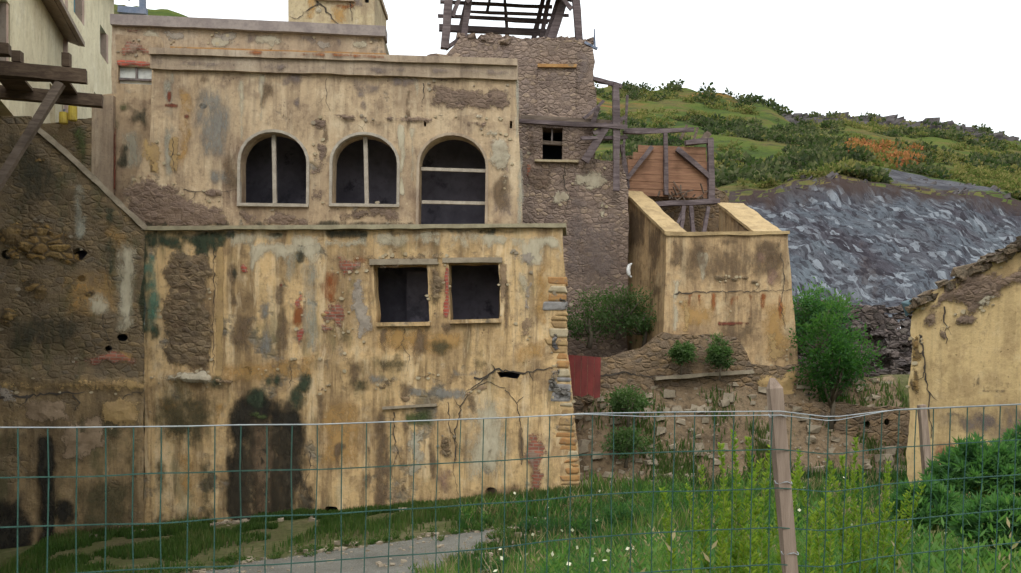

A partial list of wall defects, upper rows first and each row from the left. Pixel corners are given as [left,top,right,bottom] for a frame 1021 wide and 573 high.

crack [289,0,352,24]
peeling [427,79,514,189]
spalling [122,137,227,226]
spalling [156,250,214,374]
water stain [629,210,660,269]
water stain [672,240,782,278]
crack [674,253,790,329]
spalling [915,266,1021,339]
crack [919,306,950,437]
water stain [42,468,75,538]
water stain [226,445,239,489]
crack [448,364,553,497]